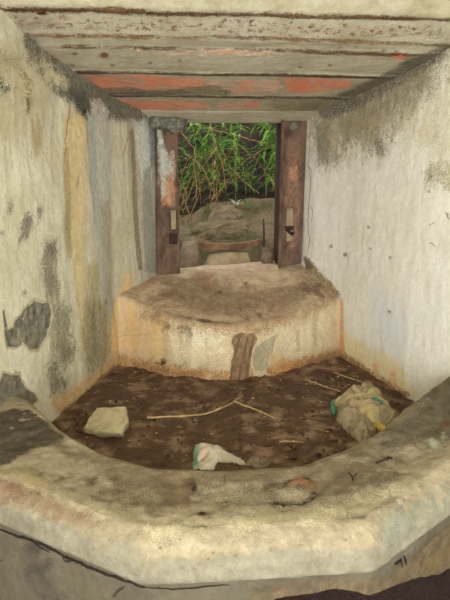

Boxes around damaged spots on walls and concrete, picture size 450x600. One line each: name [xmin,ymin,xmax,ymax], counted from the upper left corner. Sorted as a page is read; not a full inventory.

peeling [124,48,273,58]
peeling [82,74,353,112]
leakage [0,35,176,402]
rust [158,173,178,208]
rust [283,137,304,251]
flaking render [2,297,53,353]
rust [50,270,238,413]
rust [250,299,419,399]
peeling [0,370,66,465]